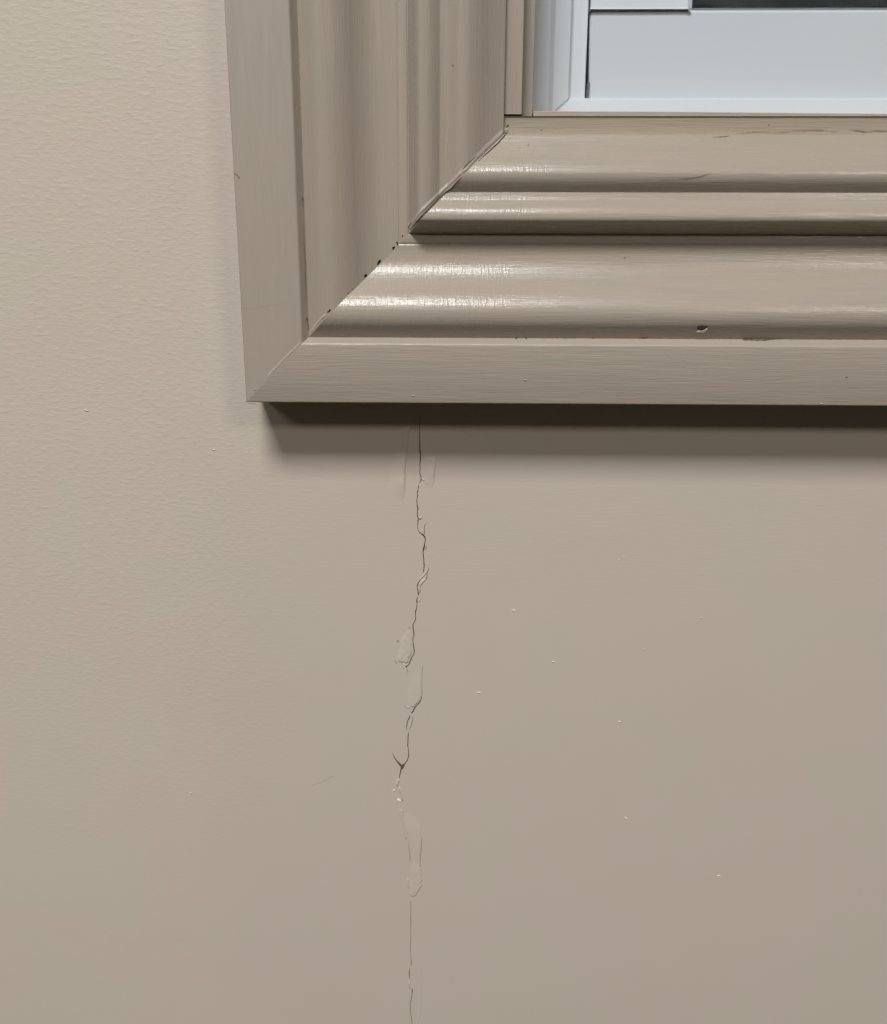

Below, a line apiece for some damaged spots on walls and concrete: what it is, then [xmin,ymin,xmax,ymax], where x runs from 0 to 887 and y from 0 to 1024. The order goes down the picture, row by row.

crack [395,424,429,673]
crack [392,697,422,889]